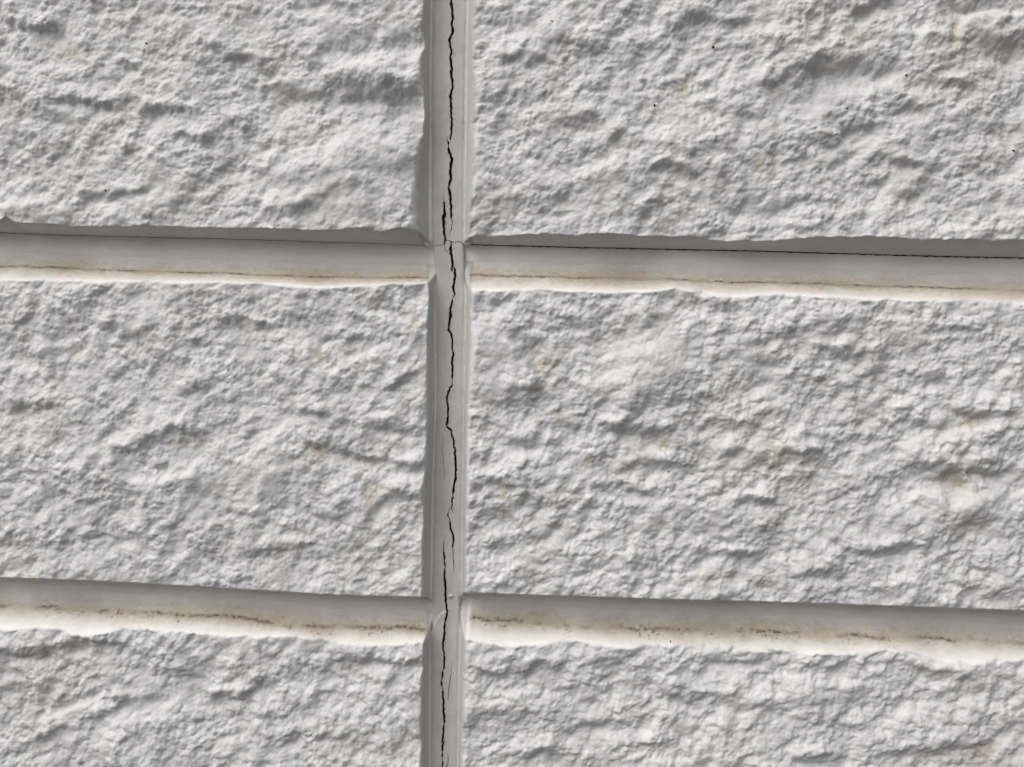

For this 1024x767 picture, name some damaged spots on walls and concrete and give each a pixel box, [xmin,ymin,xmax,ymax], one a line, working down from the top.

crack [372,0,1024,767]